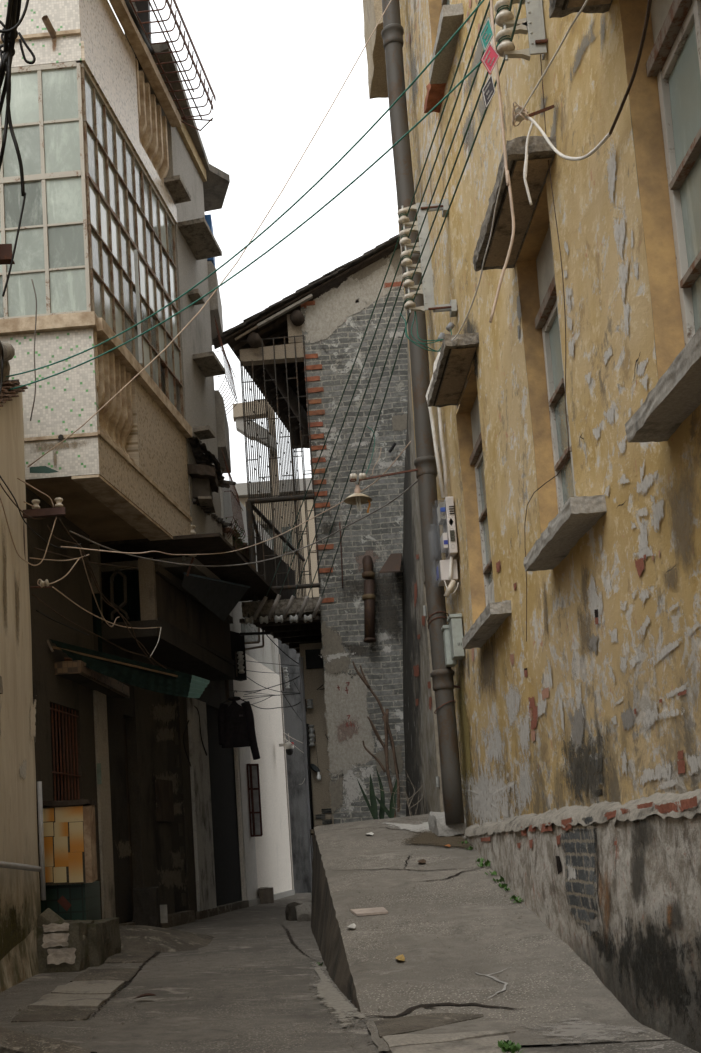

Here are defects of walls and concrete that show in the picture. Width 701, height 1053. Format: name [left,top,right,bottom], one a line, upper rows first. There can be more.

peeling [605,140,638,338]
peeling [564,269,574,357]
flaking render [375,632,394,653]
flaking render [588,571,618,655]
peeling [604,462,701,684]
flaking render [329,726,404,818]
flaking render [461,653,701,939]
water stain [631,817,651,903]
crack [88,951,160,1019]
crack [360,967,522,1053]
water stain [593,901,701,1023]